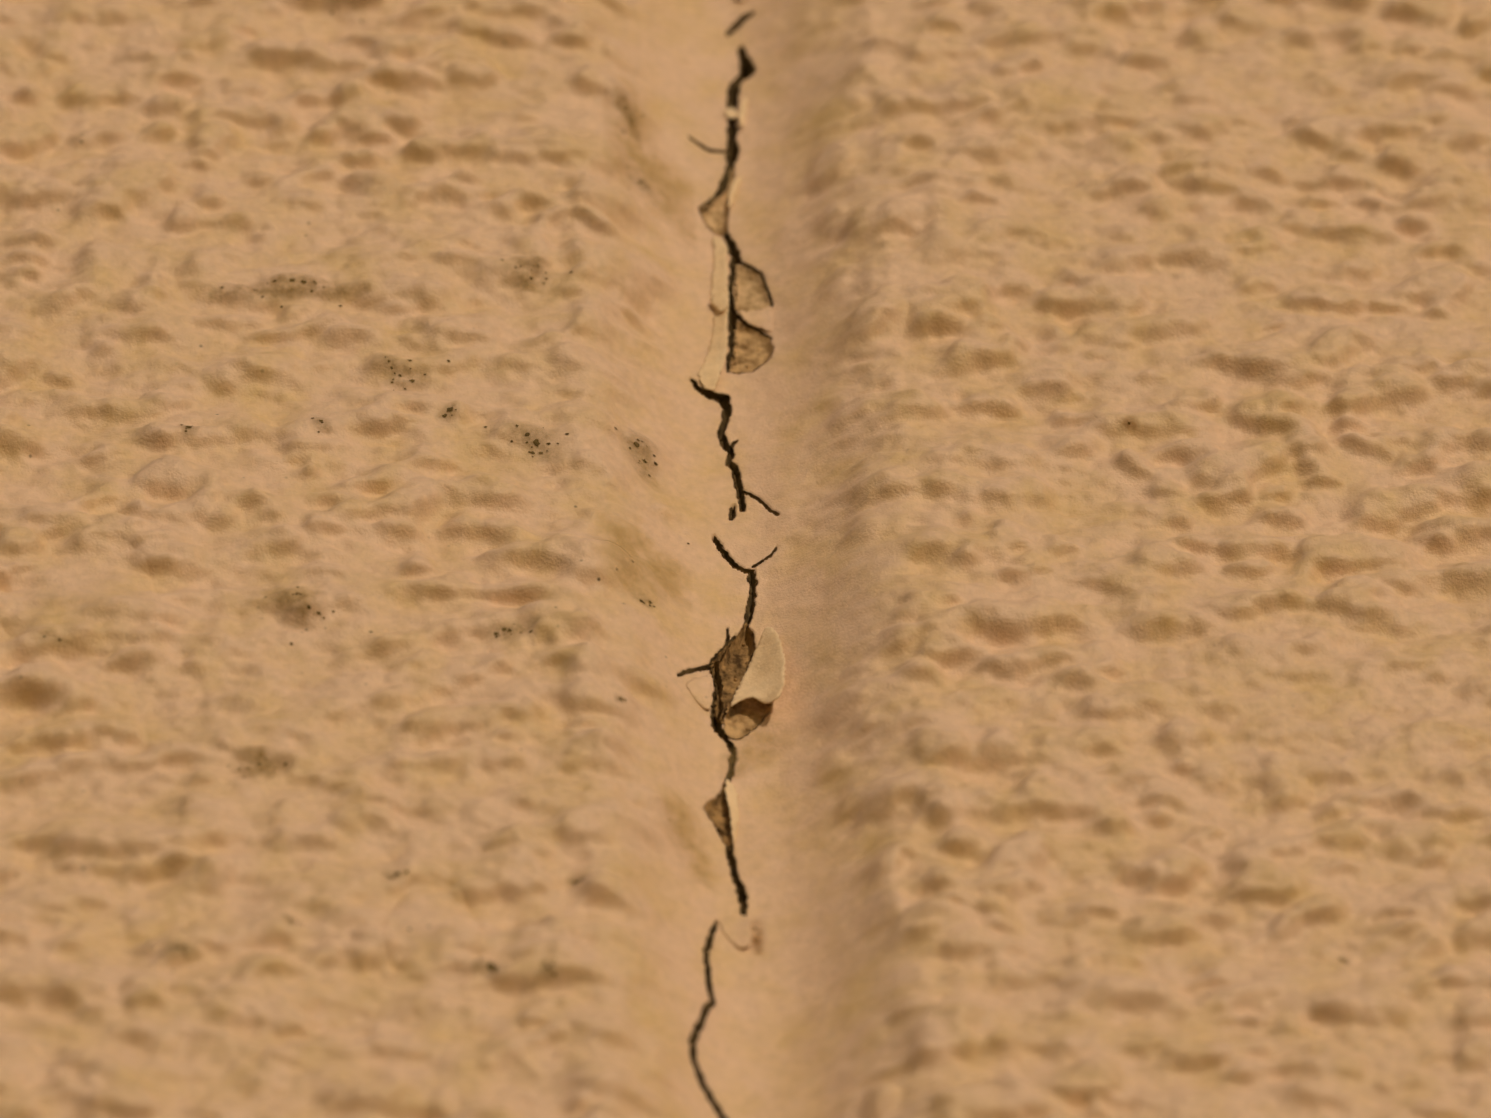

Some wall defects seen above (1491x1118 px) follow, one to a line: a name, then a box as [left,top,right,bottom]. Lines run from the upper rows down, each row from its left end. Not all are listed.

crack [677,12,779,782]
peeling [698,169,774,391]
peeling [686,623,786,739]
crack [689,844,748,1118]